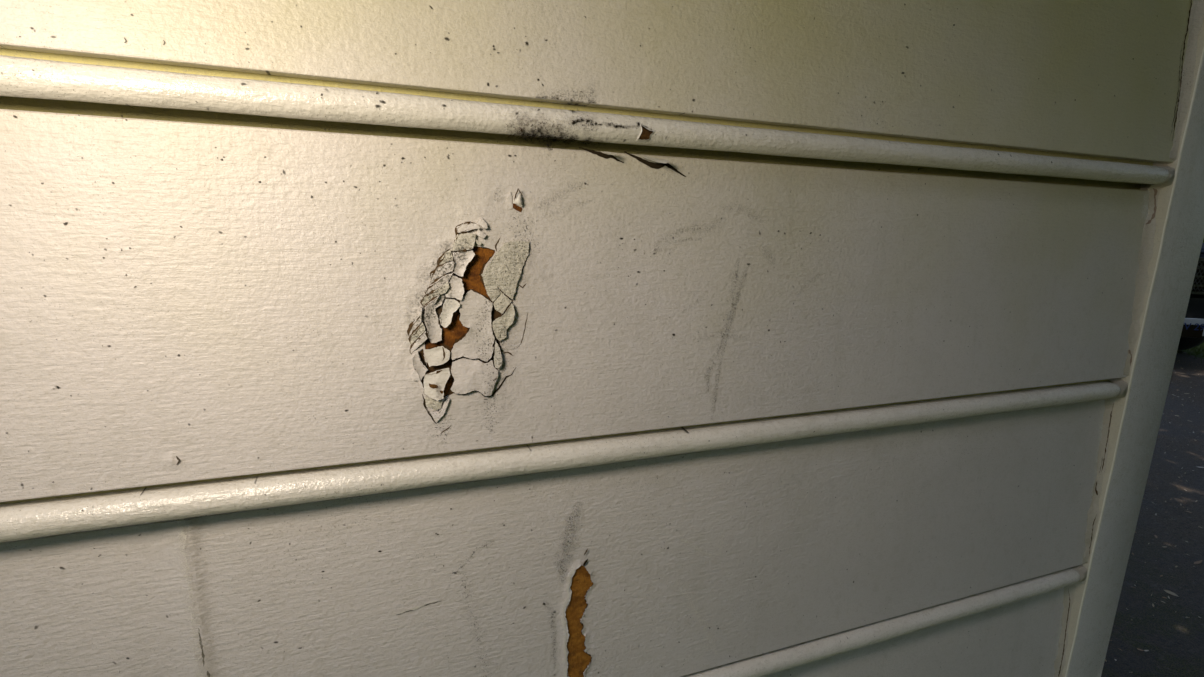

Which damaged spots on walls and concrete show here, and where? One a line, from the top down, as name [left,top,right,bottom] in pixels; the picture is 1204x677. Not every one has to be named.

crack [579,147,686,177]
peeling [373,182,555,443]
peeling [552,502,598,677]